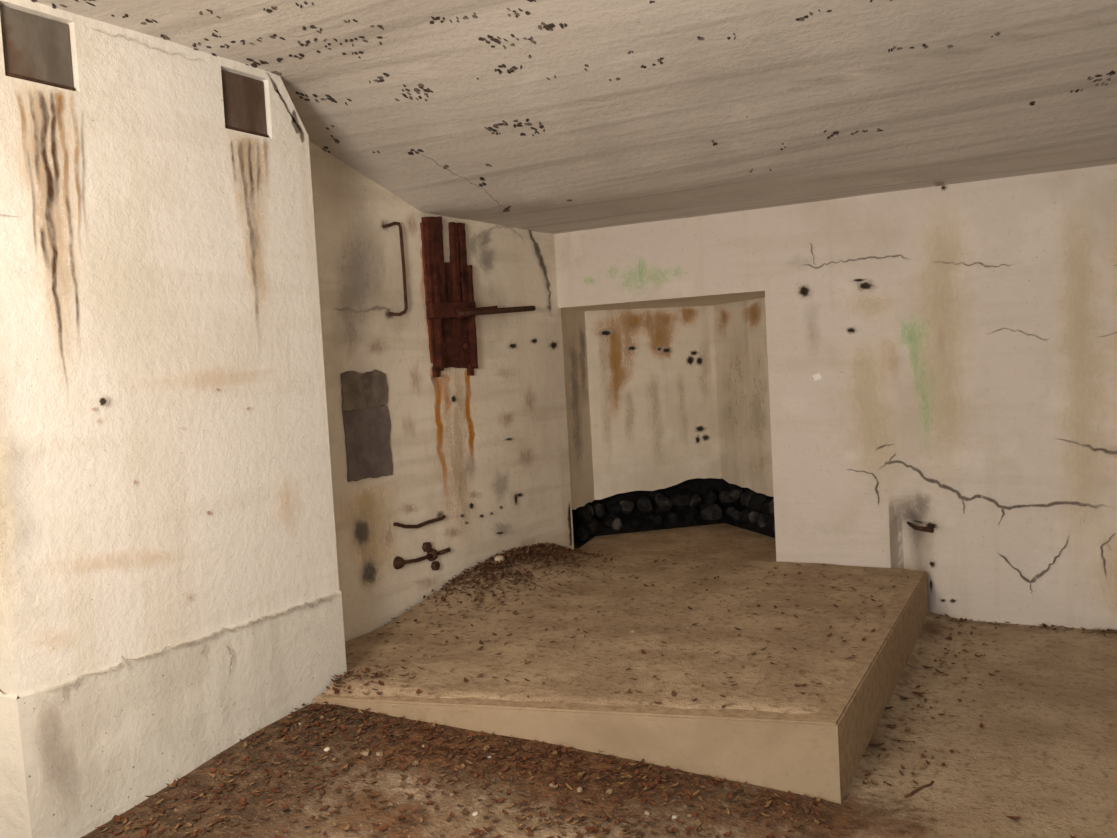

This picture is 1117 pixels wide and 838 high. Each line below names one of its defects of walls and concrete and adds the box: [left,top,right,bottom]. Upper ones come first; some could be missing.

crack [807,244,904,269]
crack [934,260,1009,268]
crack [992,328,1047,340]
corrosion [431,366,475,514]
crack [849,444,1100,525]
crack [999,539,1068,593]
crack [1100,534,1115,575]
crack [61,598,324,704]